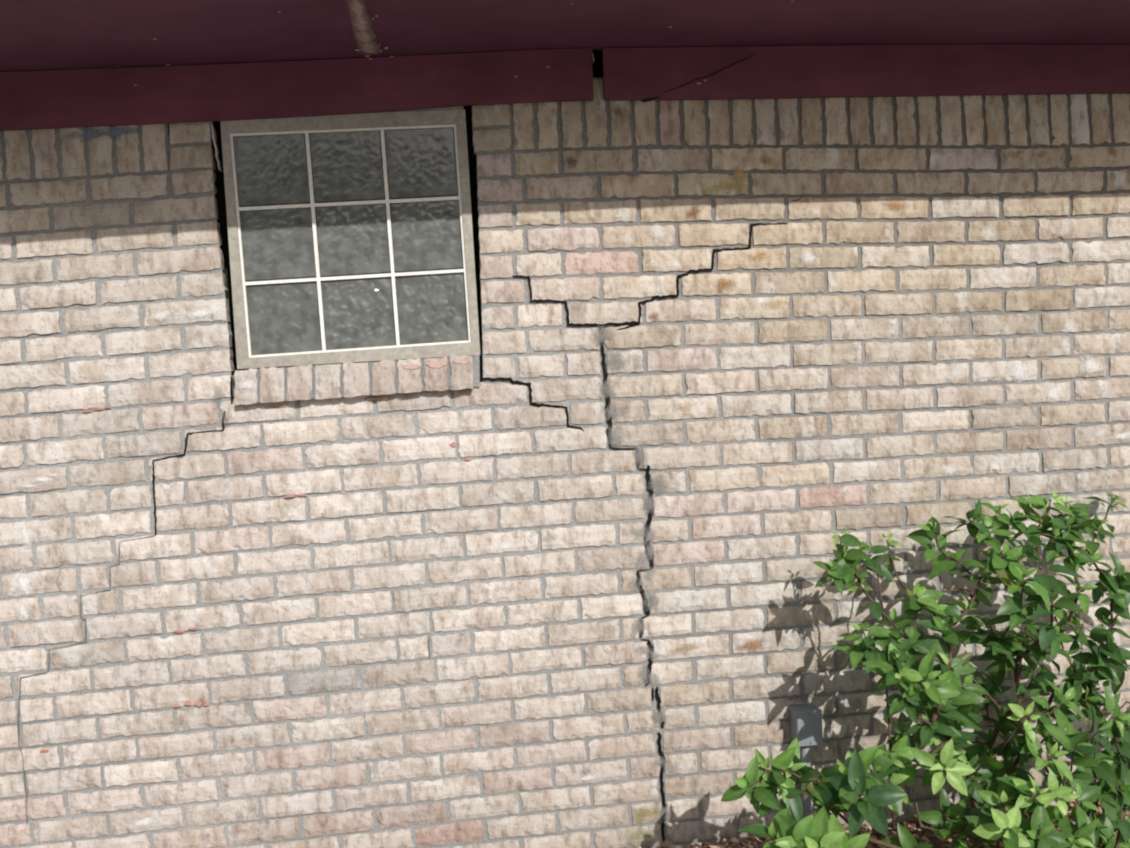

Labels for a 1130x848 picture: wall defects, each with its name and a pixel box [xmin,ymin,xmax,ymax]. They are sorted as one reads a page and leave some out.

crack [17,377,233,824]
crack [480,197,801,842]